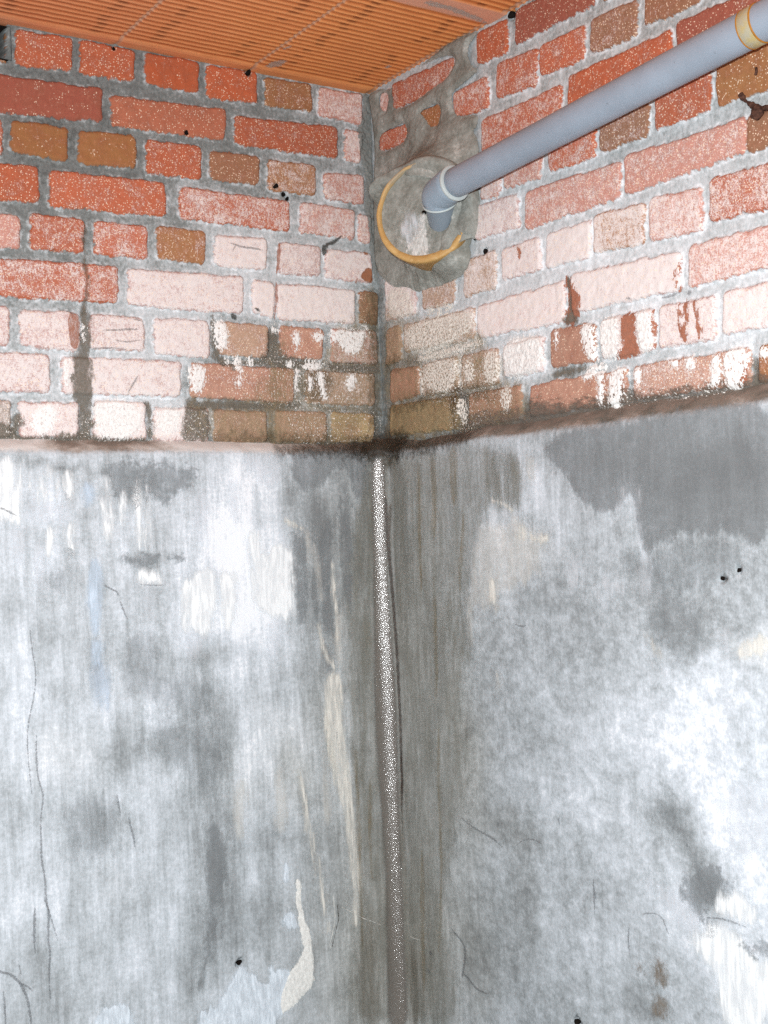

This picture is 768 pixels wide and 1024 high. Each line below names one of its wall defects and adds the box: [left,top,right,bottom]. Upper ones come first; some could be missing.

damp [0,227,768,888]
peeling [95,1003,133,1024]
peeling [197,863,314,1024]
damp [663,867,768,1024]